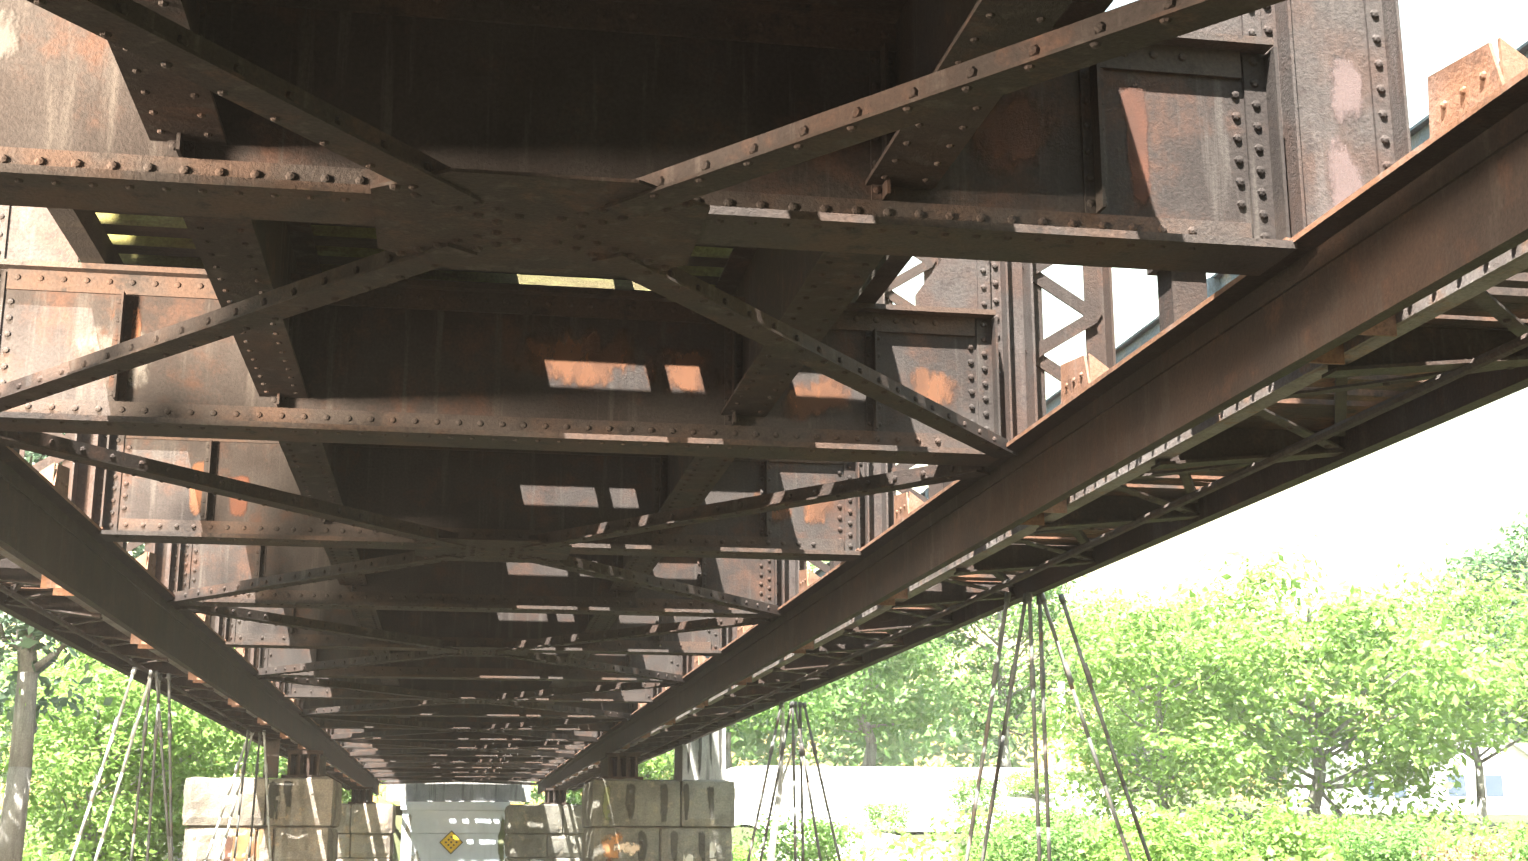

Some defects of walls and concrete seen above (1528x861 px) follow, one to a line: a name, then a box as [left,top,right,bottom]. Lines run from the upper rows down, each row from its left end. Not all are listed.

rust [1119,85,1150,205]
rust [781,376,850,420]
rust [911,367,956,404]